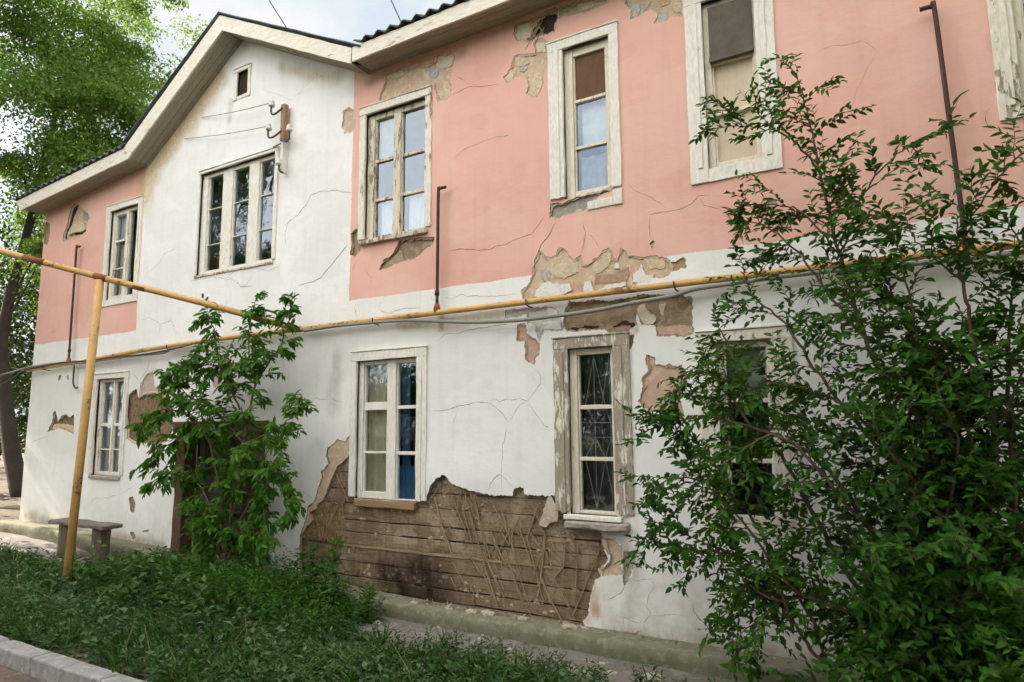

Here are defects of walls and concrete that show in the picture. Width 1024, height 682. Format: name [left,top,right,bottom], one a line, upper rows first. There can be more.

peeling [625,0,683,24]
peeling [380,55,455,102]
peeling [503,0,609,98]
spalling [550,185,613,219]
spalling [380,237,435,270]
crack [456,218,554,266]
peeling [505,241,694,364]
spalling [49,412,74,434]
spalling [127,371,173,444]
crack [436,375,547,490]
peeling [638,355,686,417]
spalling [301,437,639,625]